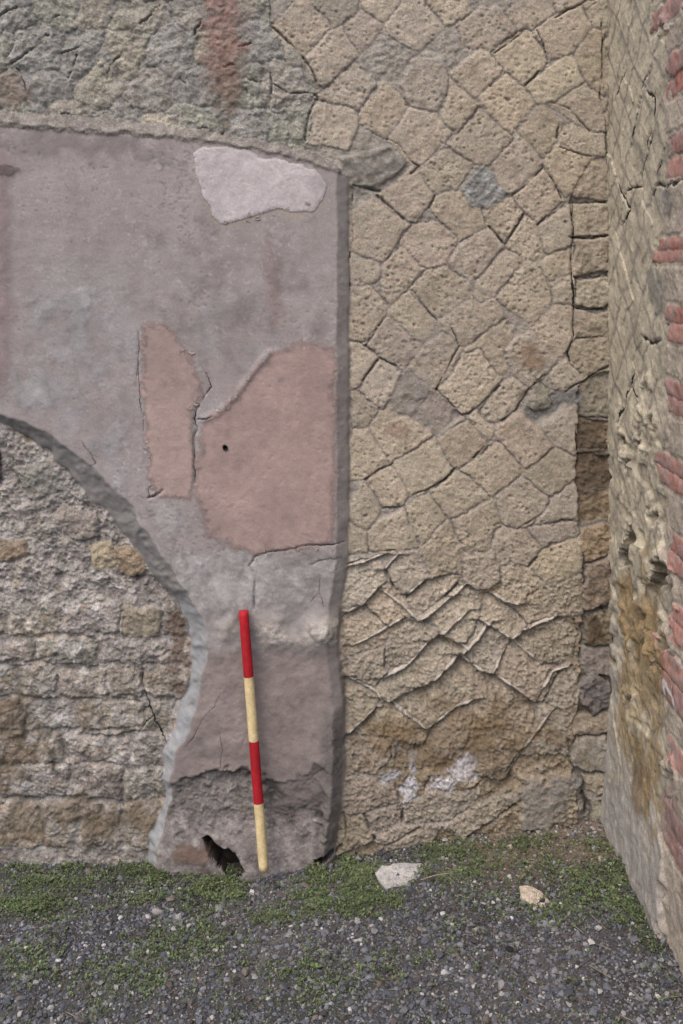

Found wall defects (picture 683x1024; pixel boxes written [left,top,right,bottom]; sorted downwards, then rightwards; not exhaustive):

peeling [139,321,337,560]
flaking render [0,415,334,881]
crack [141,673,217,745]
water stain [380,739,478,803]